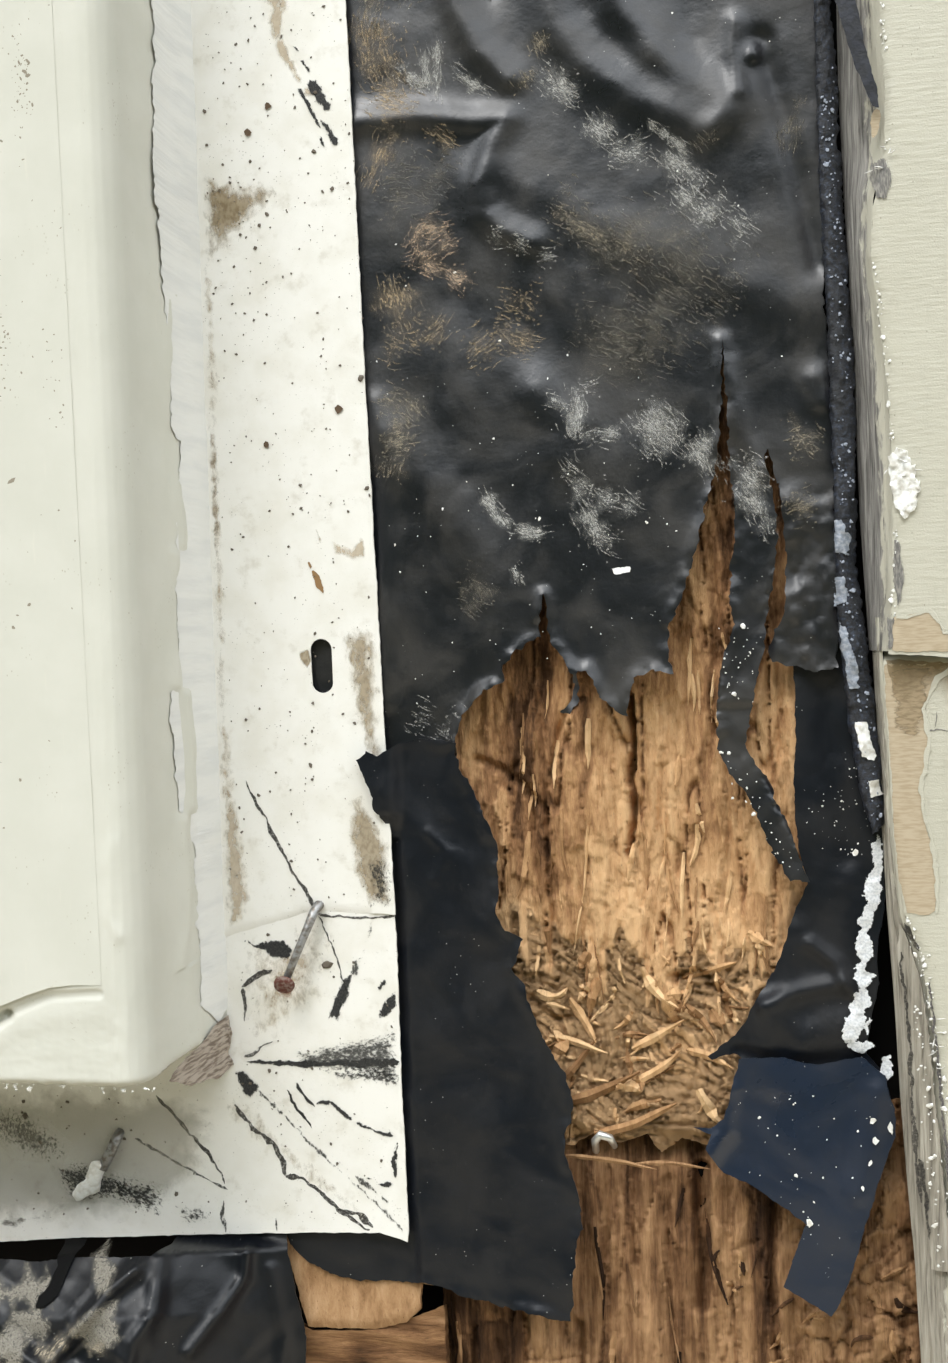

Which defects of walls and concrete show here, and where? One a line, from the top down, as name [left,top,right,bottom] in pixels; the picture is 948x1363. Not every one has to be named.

leakage [210,194,221,226]
peeling [884,540,948,915]
peeling [847,1017,893,1080]
peeling [868,1118,893,1166]